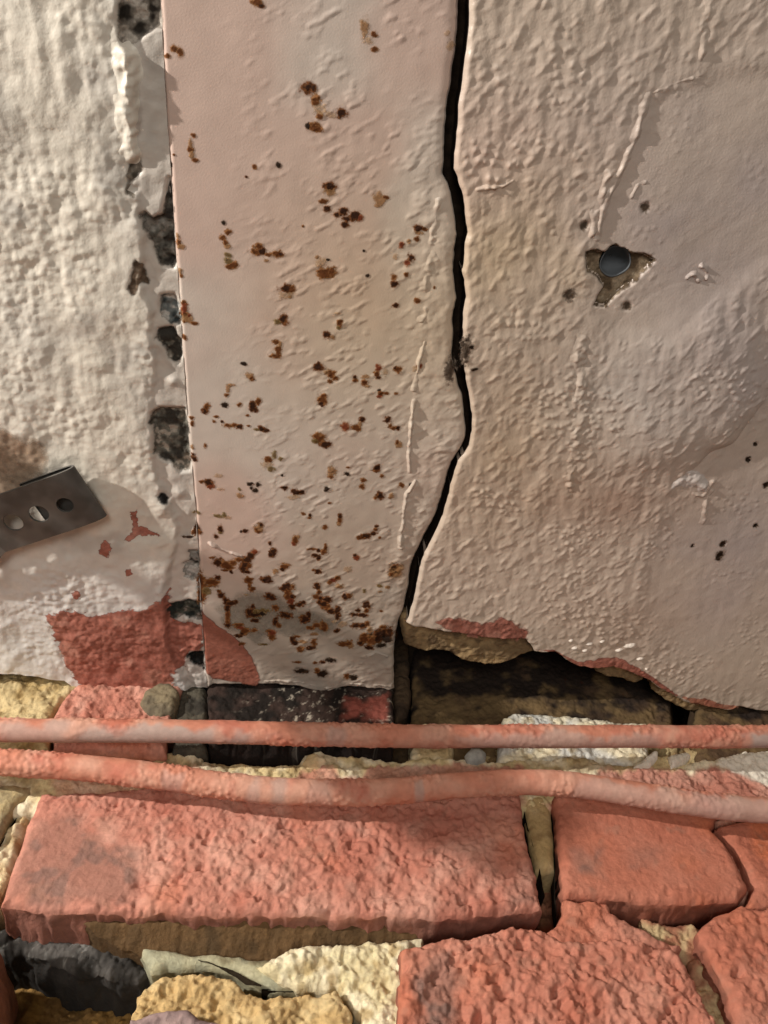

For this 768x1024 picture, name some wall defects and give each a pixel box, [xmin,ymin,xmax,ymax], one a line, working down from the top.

spalling [118,0,163,44]
corrosion [299,81,348,132]
spalling [140,181,176,266]
corrosion [318,181,363,228]
peeling [580,76,695,310]
spalling [157,293,182,361]
crack [394,0,478,644]
spalling [148,407,192,470]
corrosion [189,383,270,433]
corrosion [322,464,411,530]
corrosion [196,522,404,678]
spalling [399,607,534,664]